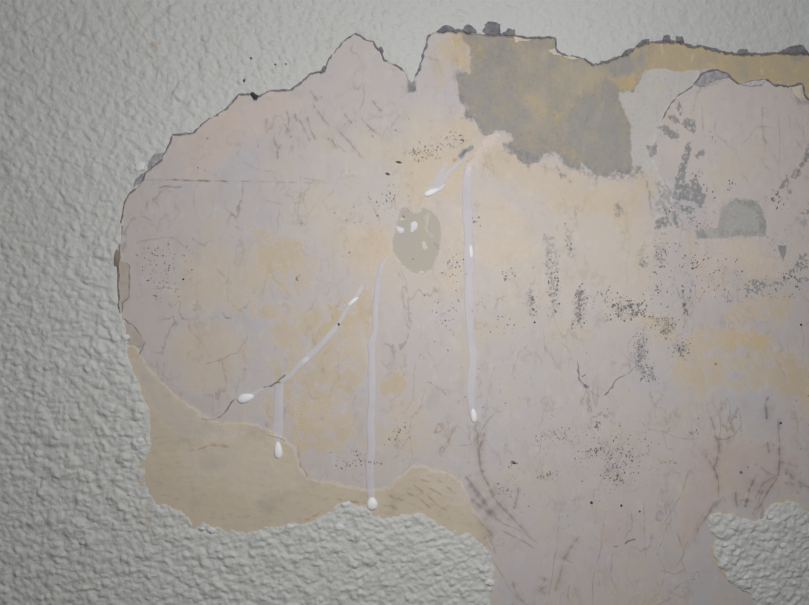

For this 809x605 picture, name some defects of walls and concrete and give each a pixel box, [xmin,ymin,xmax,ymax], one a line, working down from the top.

flaking render [456,21,809,218]
flaking render [393,208,441,274]
damp [571,238,738,382]
peeling [127,346,369,534]
peeling [369,465,490,546]
damp [552,421,643,490]